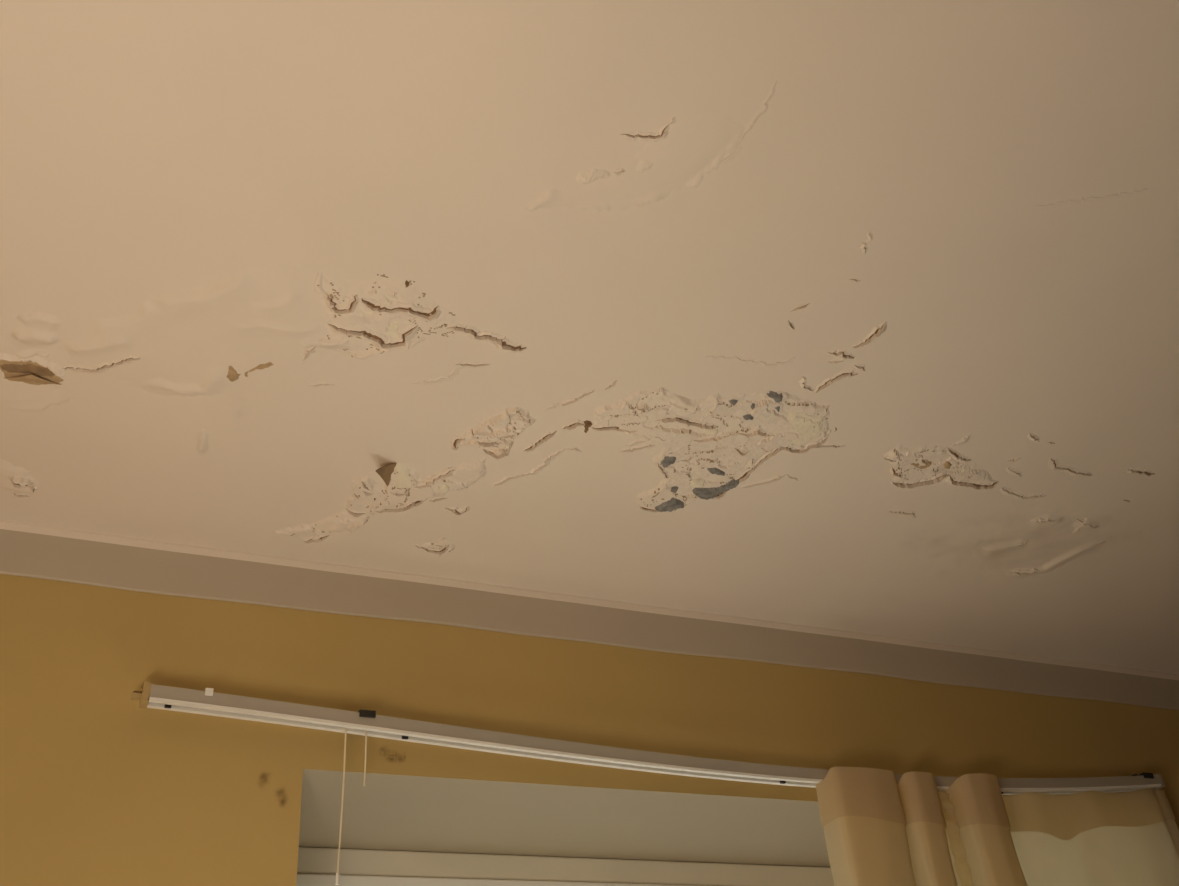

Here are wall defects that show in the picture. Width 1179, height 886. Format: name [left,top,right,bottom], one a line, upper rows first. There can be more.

spalling [0,353,67,385]
peeling [306,270,467,360]
crack [705,303,888,393]
peeling [268,407,537,544]
peeling [594,387,832,512]
peeling [884,434,999,490]
crack [999,433,1093,500]
crack [1126,468,1155,476]